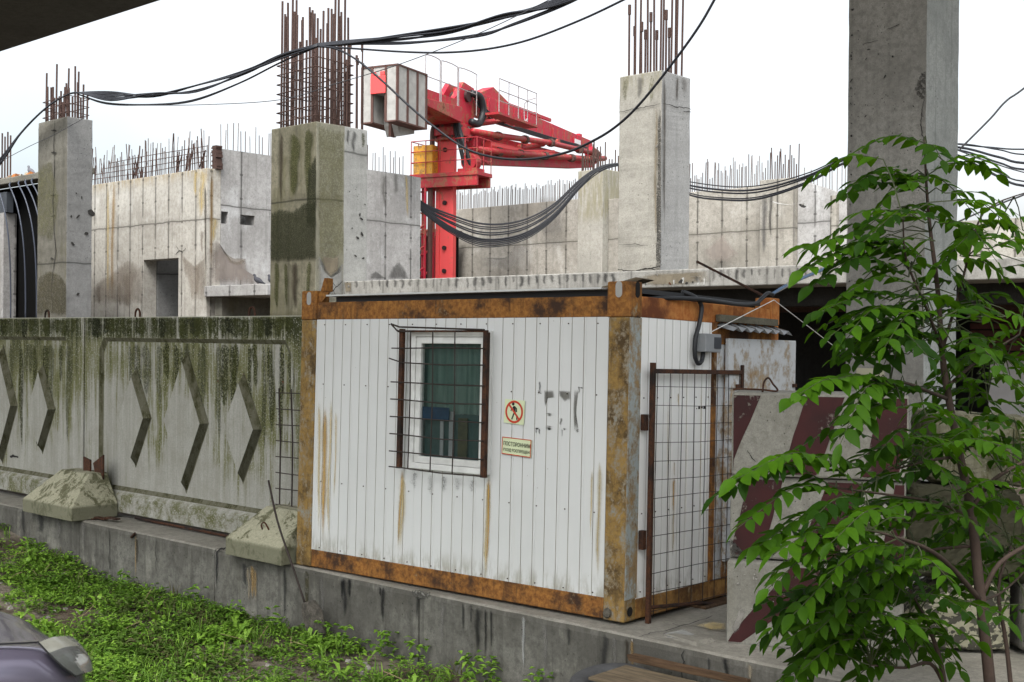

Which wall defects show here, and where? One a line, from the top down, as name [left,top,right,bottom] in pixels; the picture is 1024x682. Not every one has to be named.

water stain [280,129,313,194]
water stain [274,262,311,305]
water stain [1,318,294,442]
corrosion [318,417,336,520]
water stain [341,580,351,610]
water stain [462,604,492,650]